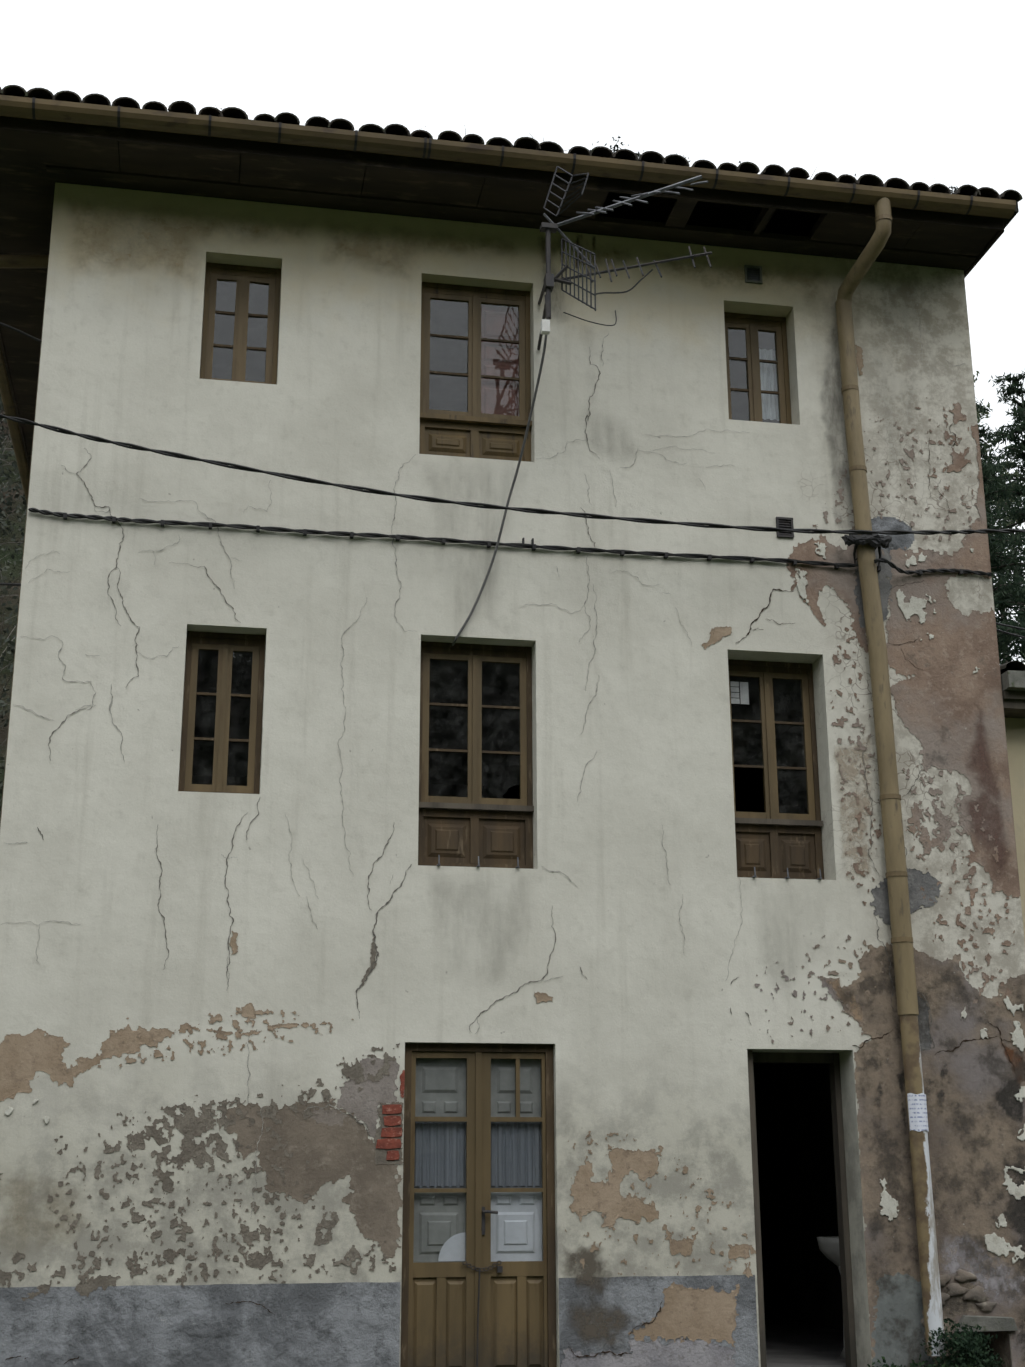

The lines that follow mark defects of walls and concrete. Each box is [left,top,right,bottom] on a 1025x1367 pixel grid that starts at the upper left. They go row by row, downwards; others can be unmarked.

crack [16,448,272,761]
crack [156,826,169,970]
spalling [0,1003,405,1301]
crack [247,1039,264,1220]
crack [221,798,317,988]
crack [338,454,416,1019]
crack [469,914,587,1034]
crack [526,333,750,802]
crack [736,589,794,643]
spalling [786,461,882,906]
spalling [754,935,921,1358]
spalling [864,397,1025,1367]